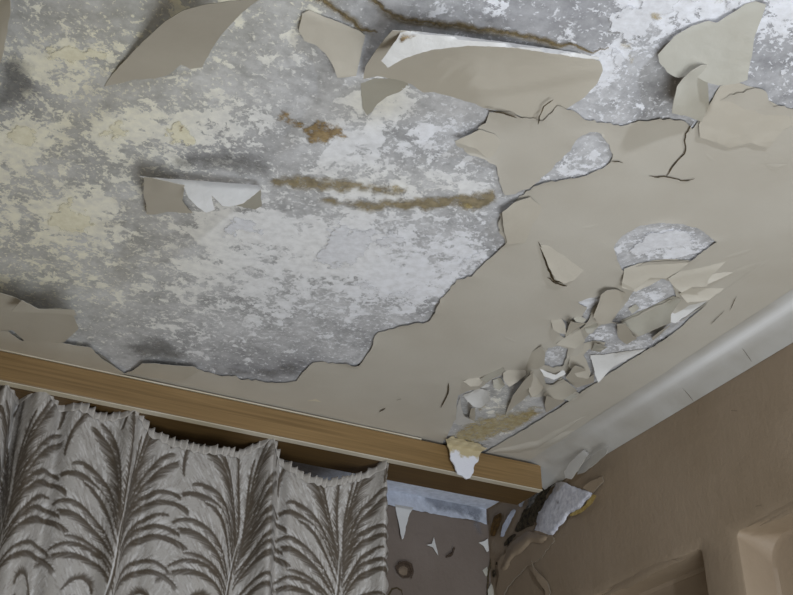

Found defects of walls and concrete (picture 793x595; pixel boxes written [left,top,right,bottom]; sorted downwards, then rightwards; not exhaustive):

crack [317,0,378,33]
crack [371,0,609,54]
water stain [3,63,31,99]
crack [652,122,693,181]
water stain [272,177,495,211]
peeling [0,0,793,383]
peeling [442,223,733,453]
flaking render [492,476,604,577]